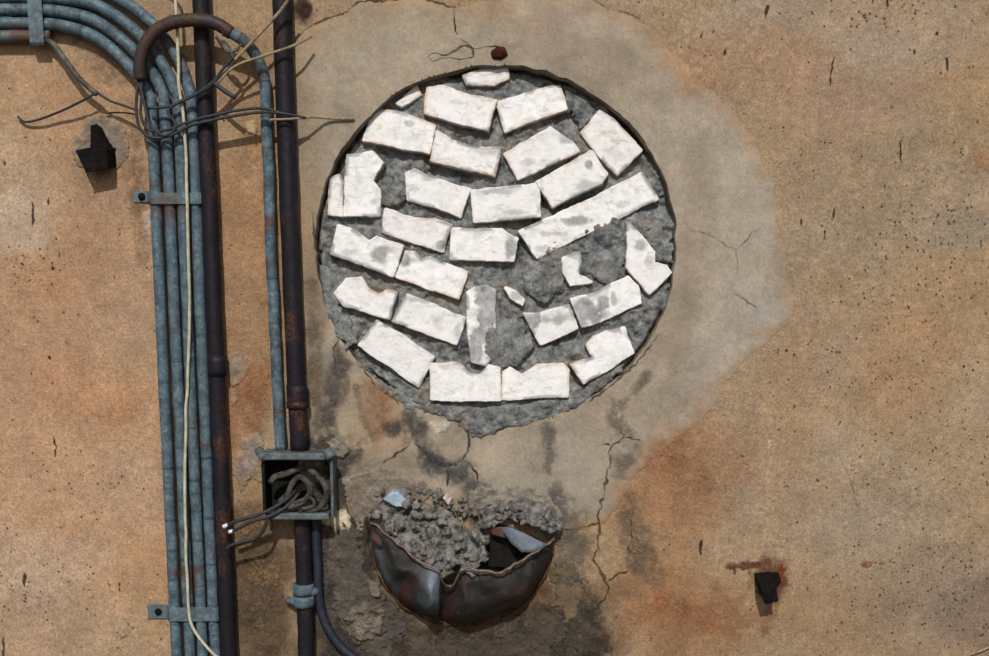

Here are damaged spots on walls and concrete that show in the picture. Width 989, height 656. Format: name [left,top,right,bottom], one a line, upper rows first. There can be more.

crack [295,0,385,38]
crack [427,0,497,61]
peeling [429,418,452,436]
leakage [305,312,607,656]
crack [563,337,657,656]
spalling [320,466,589,656]
corrosion [726,558,787,599]